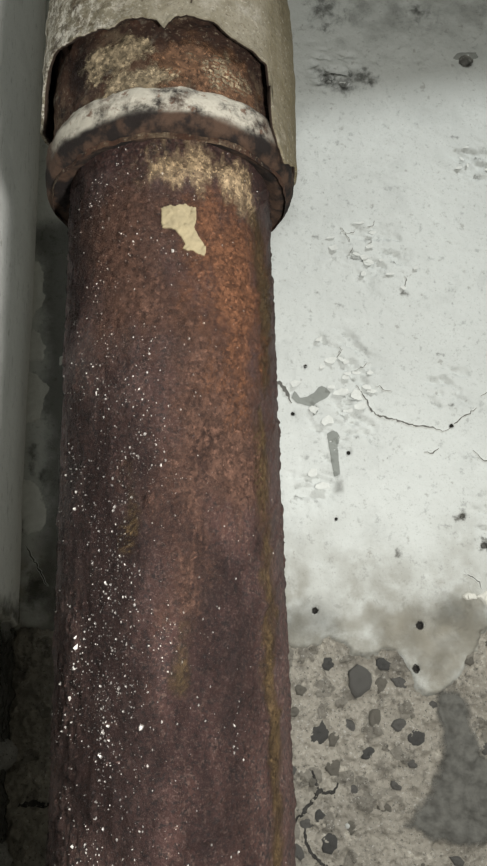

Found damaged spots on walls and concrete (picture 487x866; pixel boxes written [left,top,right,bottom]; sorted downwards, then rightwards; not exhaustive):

peeling [290,346,392,489]
crack [356,385,487,454]
peeling [463,591,487,606]
spalling [4,626,55,866]
spalling [288,631,487,866]